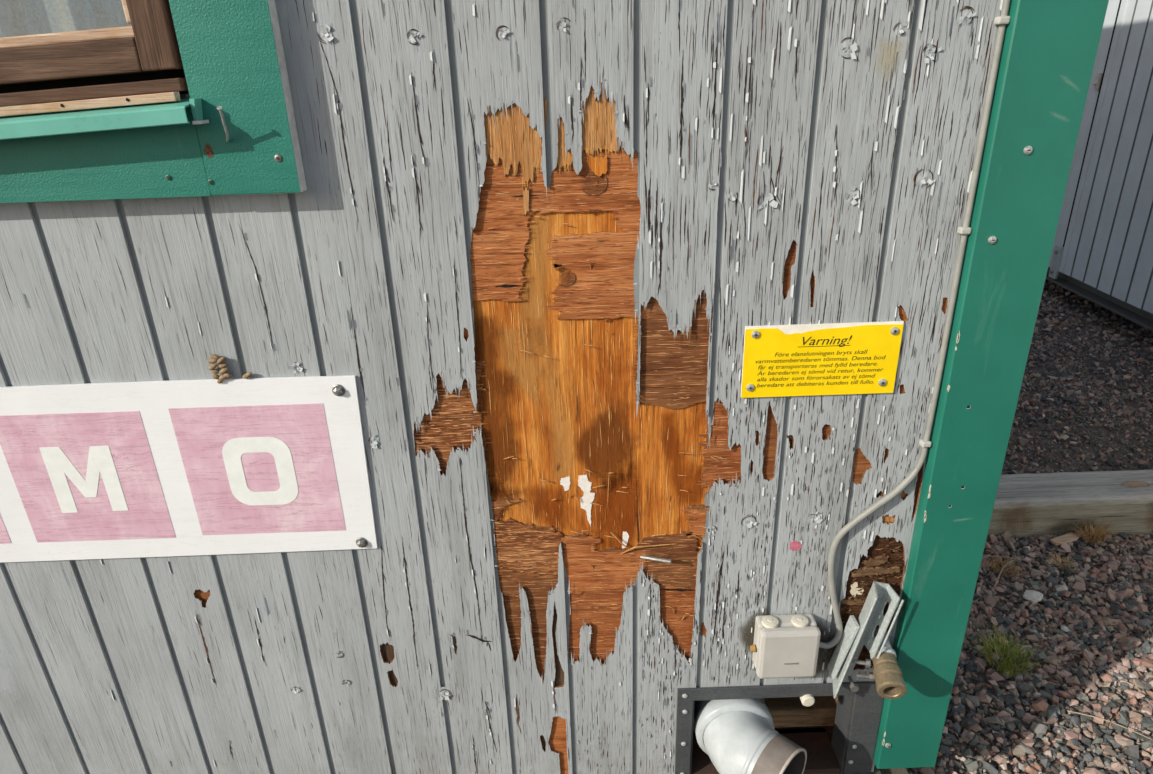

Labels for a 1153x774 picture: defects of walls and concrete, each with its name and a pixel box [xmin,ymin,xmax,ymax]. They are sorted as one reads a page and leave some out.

peeling [782,240,796,298]
peeling [750,405,793,480]
peeling [852,448,870,483]
peeling [560,474,595,526]
peeling [195,589,210,606]
peeling [840,556,900,605]
peeling [380,642,398,685]
peeling [547,597,564,686]
peeling [540,716,569,774]